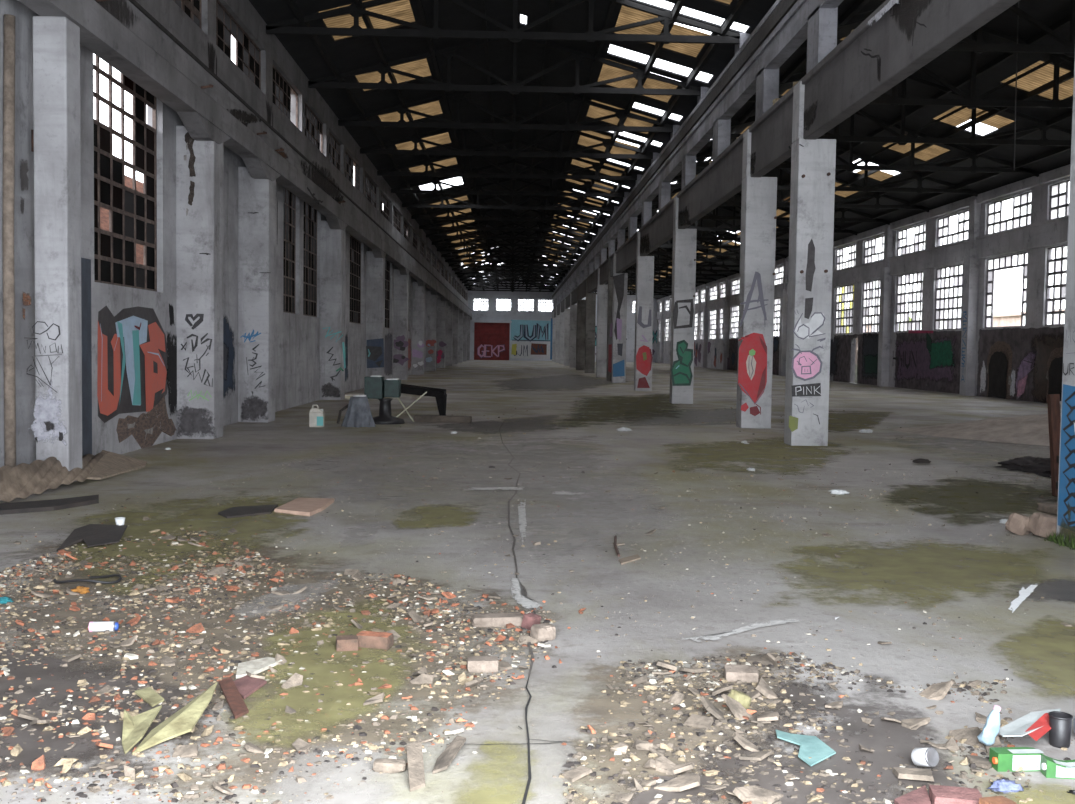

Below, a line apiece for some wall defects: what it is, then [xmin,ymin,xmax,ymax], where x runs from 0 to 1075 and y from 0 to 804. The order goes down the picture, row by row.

spalling [184,132,196,216]
damp [177,406,215,437]
damp [241,393,268,421]
crack [499,415,567,804]